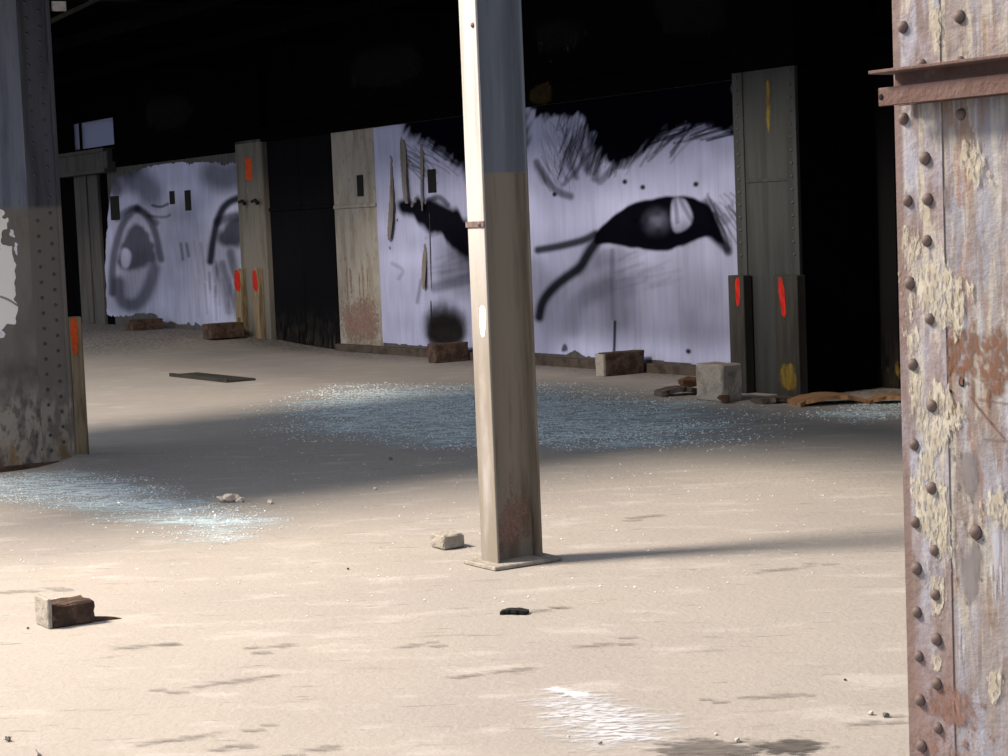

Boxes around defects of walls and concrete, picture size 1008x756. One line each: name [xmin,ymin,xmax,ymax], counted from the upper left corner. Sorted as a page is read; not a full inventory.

peeling [898,225,1008,618]
rust [946,322,1008,413]